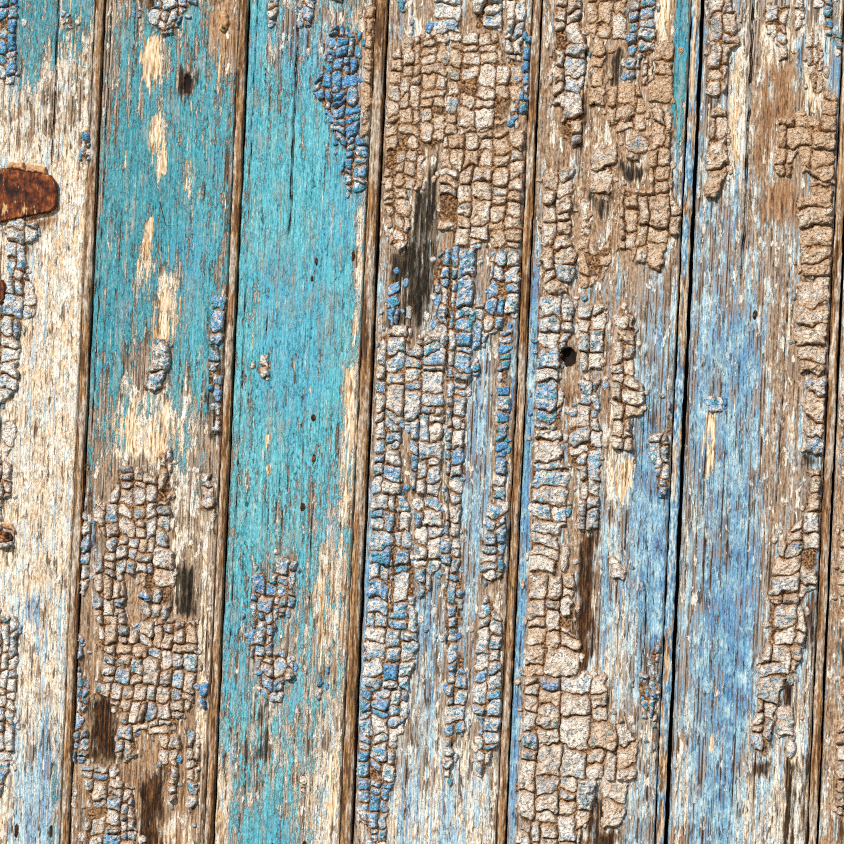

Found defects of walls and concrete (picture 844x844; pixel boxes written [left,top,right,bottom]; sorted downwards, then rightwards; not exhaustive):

peeling [132,0,197,37]
peeling [312,6,376,199]
peeling [703,0,742,198]
peeling [0,218,41,409]
peeling [764,0,843,456]
peeling [0,420,18,520]
peeling [355,0,532,844]
peeling [513,0,684,844]
peeling [0,608,23,795]
peeling [70,399,209,844]
peeling [241,548,301,708]
peeling [750,468,823,758]